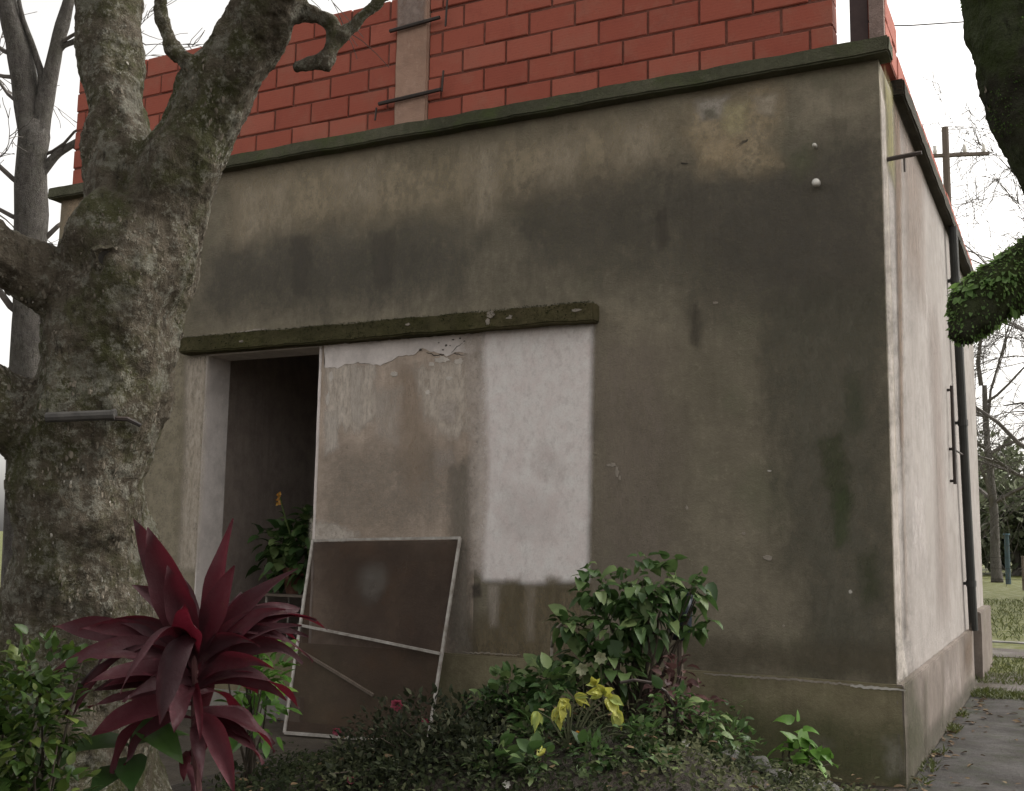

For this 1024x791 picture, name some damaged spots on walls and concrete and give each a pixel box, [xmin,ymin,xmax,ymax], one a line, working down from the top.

water stain [234,117,672,241]
peeling [324,311,512,405]
water stain [763,287,897,673]